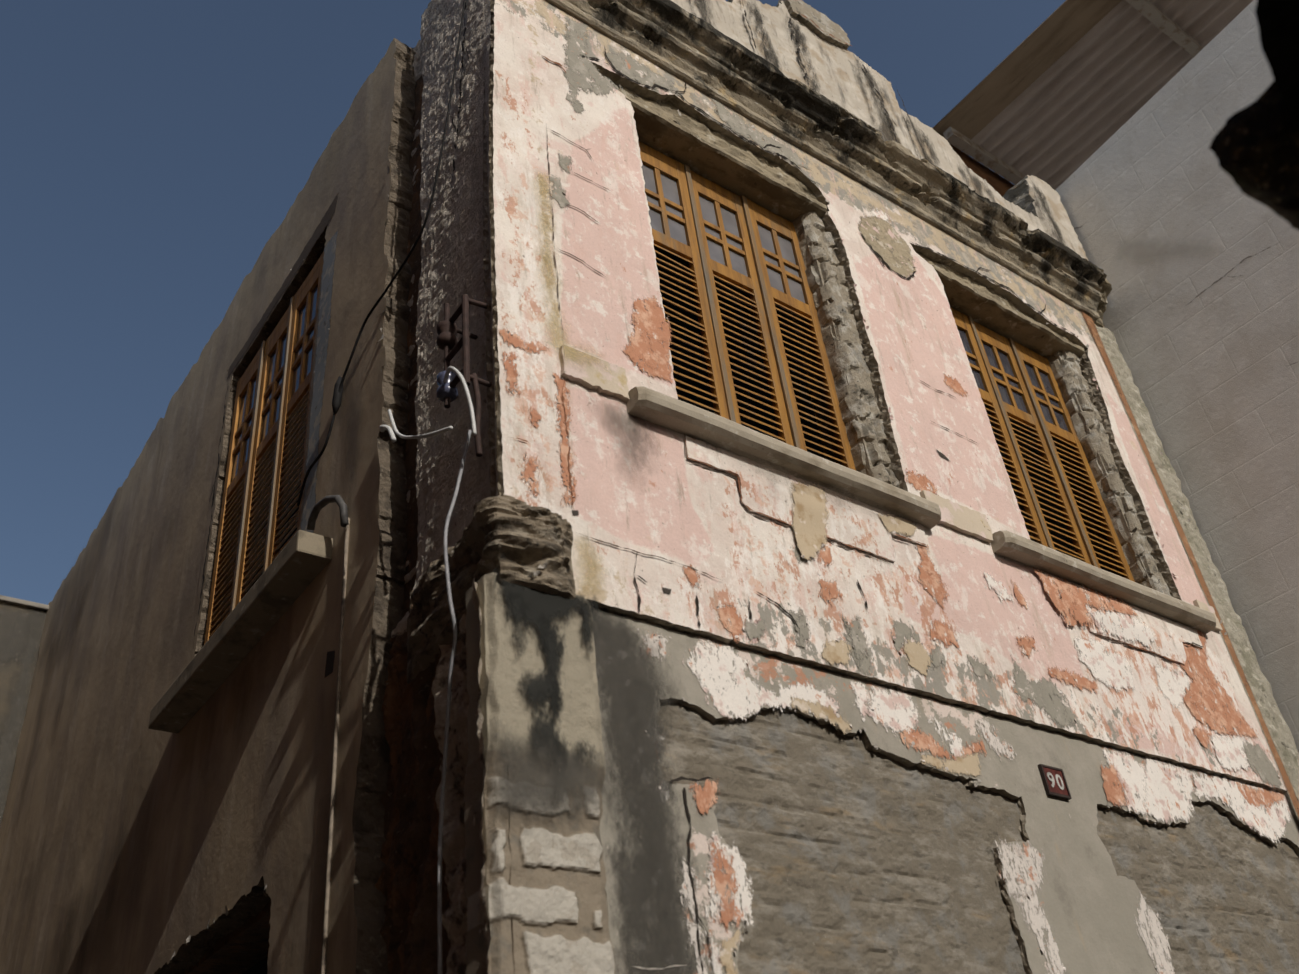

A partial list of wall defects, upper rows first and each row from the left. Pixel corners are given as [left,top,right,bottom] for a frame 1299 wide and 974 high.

water stain [0,608,46,820]
flaking render [375,0,579,974]
water stain [494,571,696,974]
water stain [593,0,627,35]
flaking render [563,18,939,496]
flaking render [637,481,1066,974]
water stain [640,0,1105,301]
flaking render [858,207,1299,974]